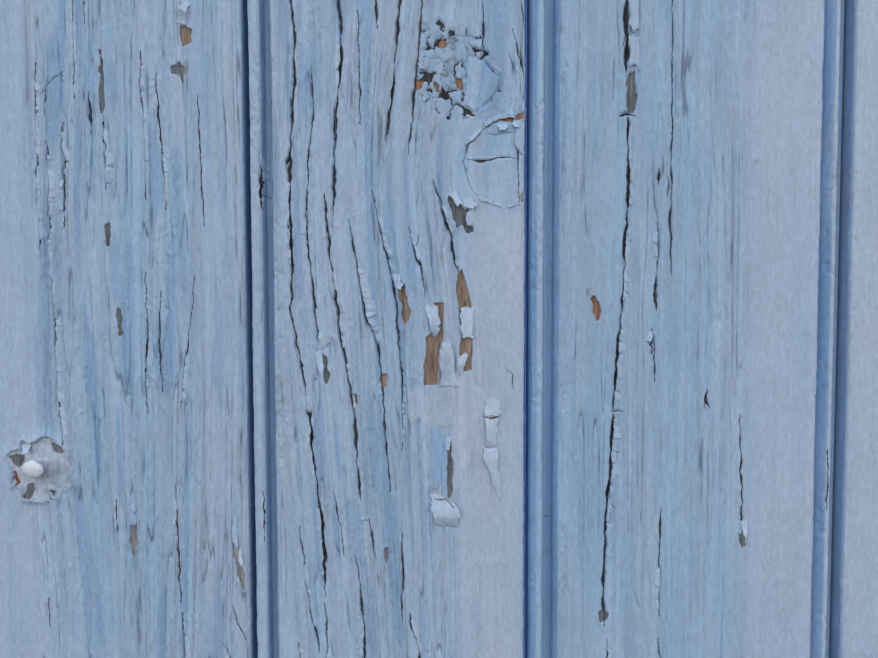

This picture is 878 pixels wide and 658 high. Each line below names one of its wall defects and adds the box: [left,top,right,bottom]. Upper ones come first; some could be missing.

peeling [415,20,502,120]
crack [622,0,630,72]
peeling [465,114,525,155]
peeling [448,163,481,233]
crack [646,0,673,381]
crack [408,226,426,291]
crack [255,0,423,658]
peeling [423,271,475,388]
crack [601,113,636,658]
peeling [7,437,71,501]
peeling [428,428,461,527]
crack [654,508,662,616]